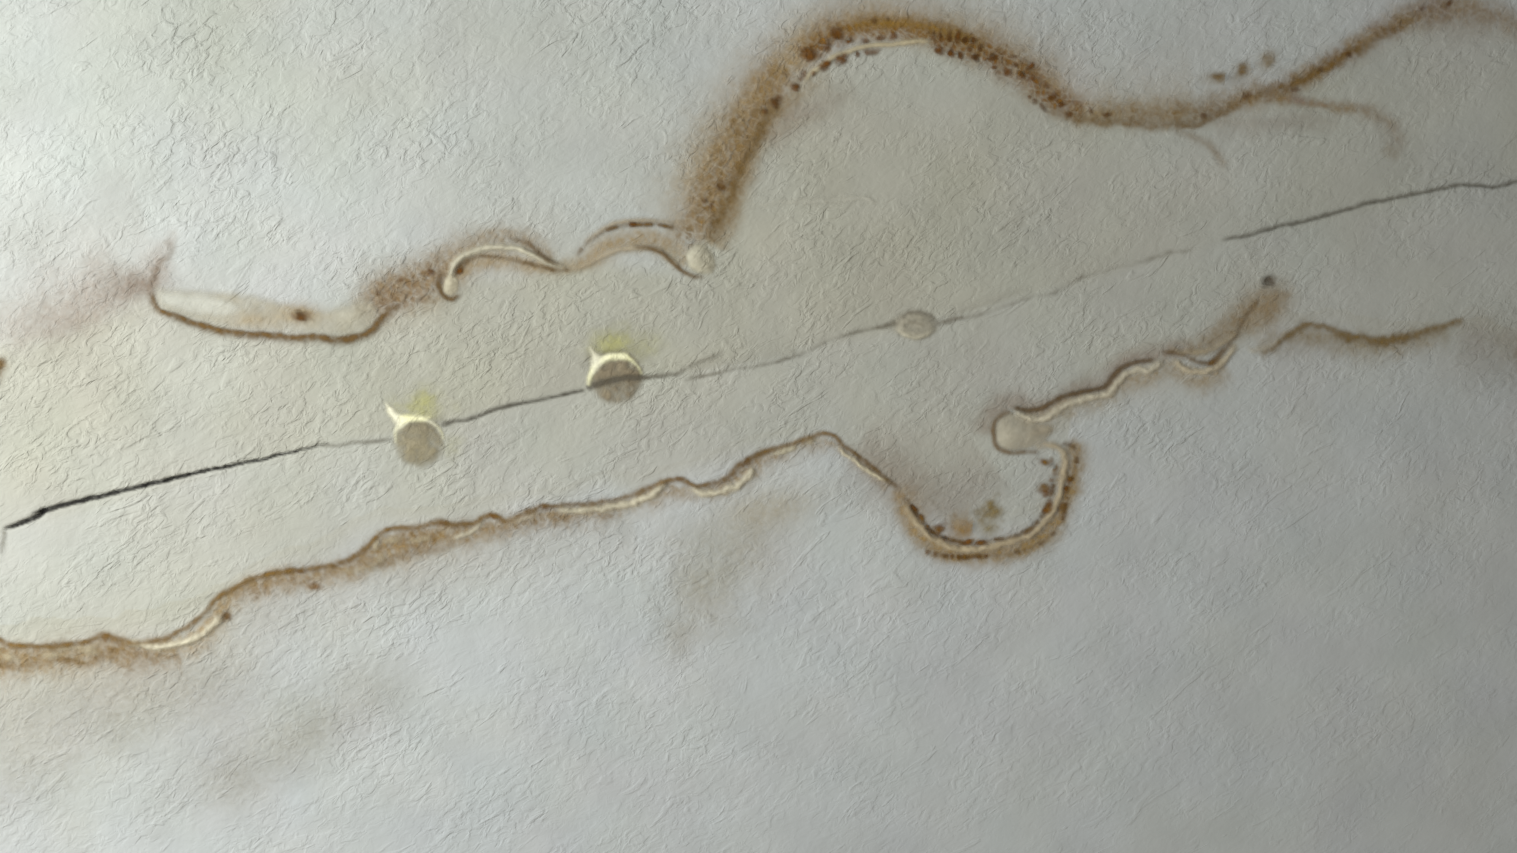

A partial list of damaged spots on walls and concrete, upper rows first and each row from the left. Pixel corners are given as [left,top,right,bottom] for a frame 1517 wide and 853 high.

water stain [1260,18,1413,107]
water stain [694,12,1113,224]
water stain [597,221,692,276]
crack [1230,181,1515,238]
water stain [122,245,556,343]
crack [445,375,661,425]
water stain [991,291,1278,454]
water stain [1279,321,1454,346]
crack [7,448,308,528]
water stain [0,432,1080,669]